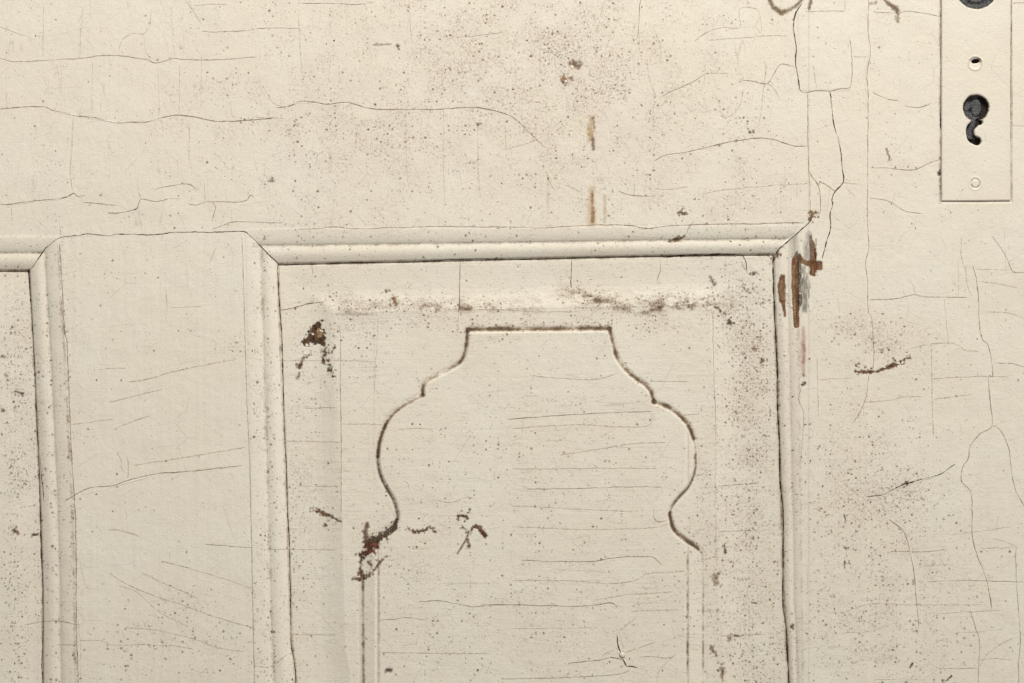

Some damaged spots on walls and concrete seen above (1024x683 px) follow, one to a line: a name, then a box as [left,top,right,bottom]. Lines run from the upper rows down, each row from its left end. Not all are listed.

crack [1,18,546,271]
crack [186,1,372,78]
crack [512,0,1024,681]